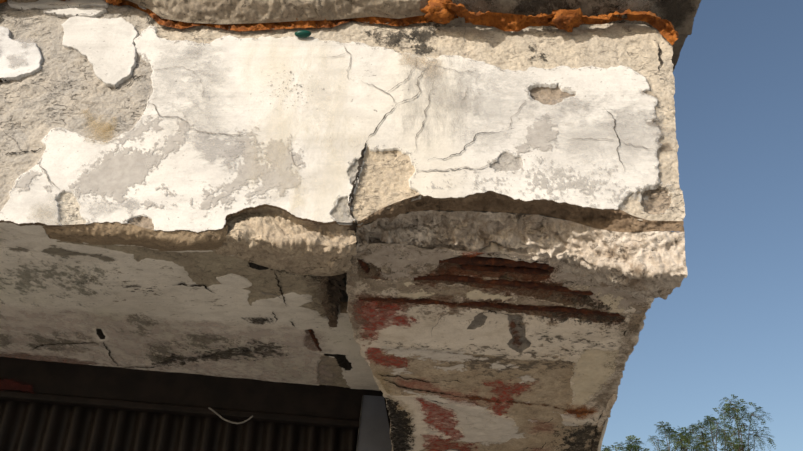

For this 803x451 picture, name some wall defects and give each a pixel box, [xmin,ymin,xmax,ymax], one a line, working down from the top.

peeling [0,0,688,333]
crack [347,54,529,244]
crack [566,111,653,161]
water stain [0,257,111,305]
crack [325,273,347,319]
rust [356,252,609,322]
crack [29,342,283,368]
water stain [151,333,288,367]
spalling [303,329,352,389]
peeling [365,289,618,451]
rust [466,395,532,405]
rust [542,404,596,419]